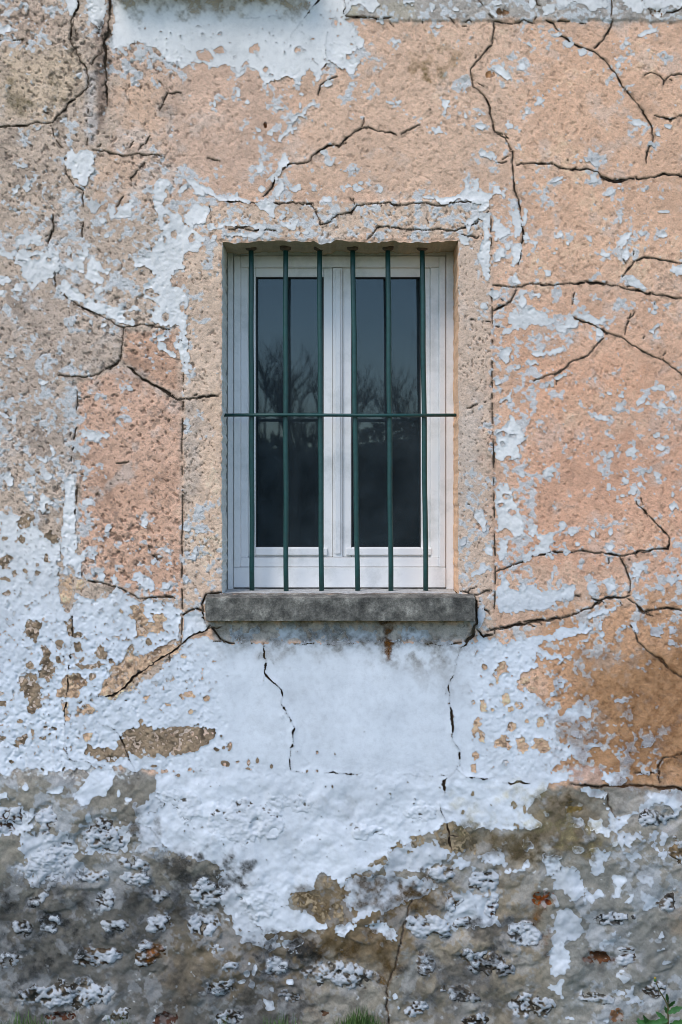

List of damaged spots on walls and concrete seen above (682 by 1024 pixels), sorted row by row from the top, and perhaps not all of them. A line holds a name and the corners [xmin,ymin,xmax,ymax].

crack [0,0,161,237]
peeling [0,0,384,374]
crack [209,109,492,246]
peeling [423,176,606,369]
crack [426,0,682,678]
peeling [622,0,682,46]
crack [18,215,298,772]
peeling [0,415,682,999]
rust [381,621,393,659]
leakage [162,853,257,893]
leakage [261,929,402,986]
leakage [344,875,438,912]